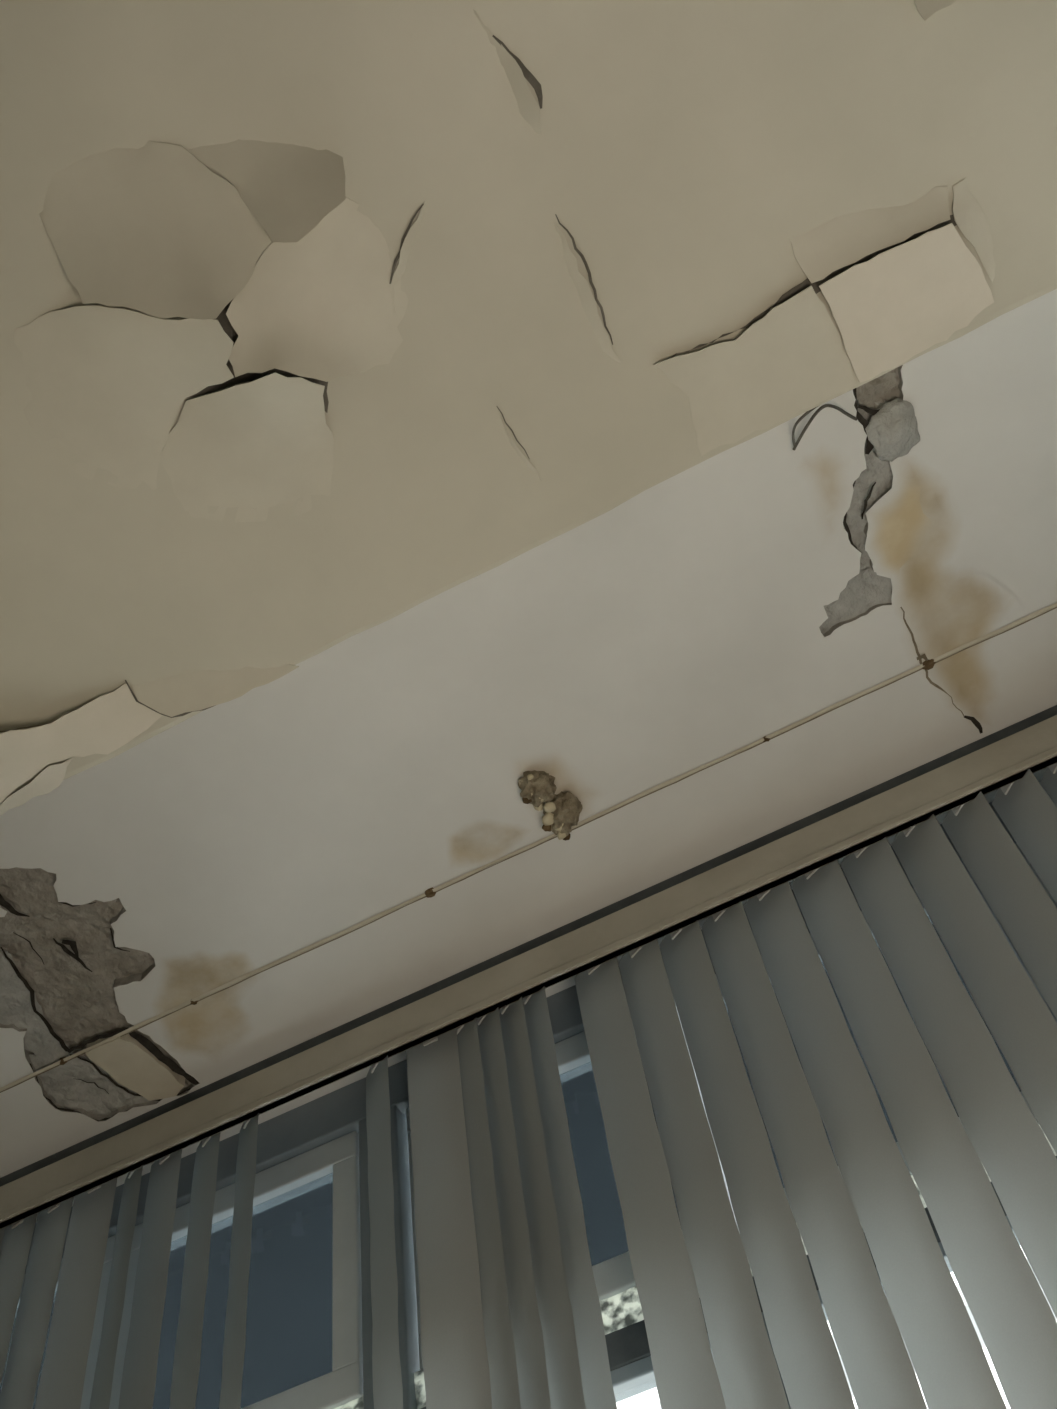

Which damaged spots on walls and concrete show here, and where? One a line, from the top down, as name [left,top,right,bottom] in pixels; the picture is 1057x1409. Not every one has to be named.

water stain [790,442,854,550]
peeling [655,177,995,637]
water stain [865,452,1017,733]
peeling [0,664,299,816]
crack [0,603,1057,1093]
spalling [0,867,200,1122]